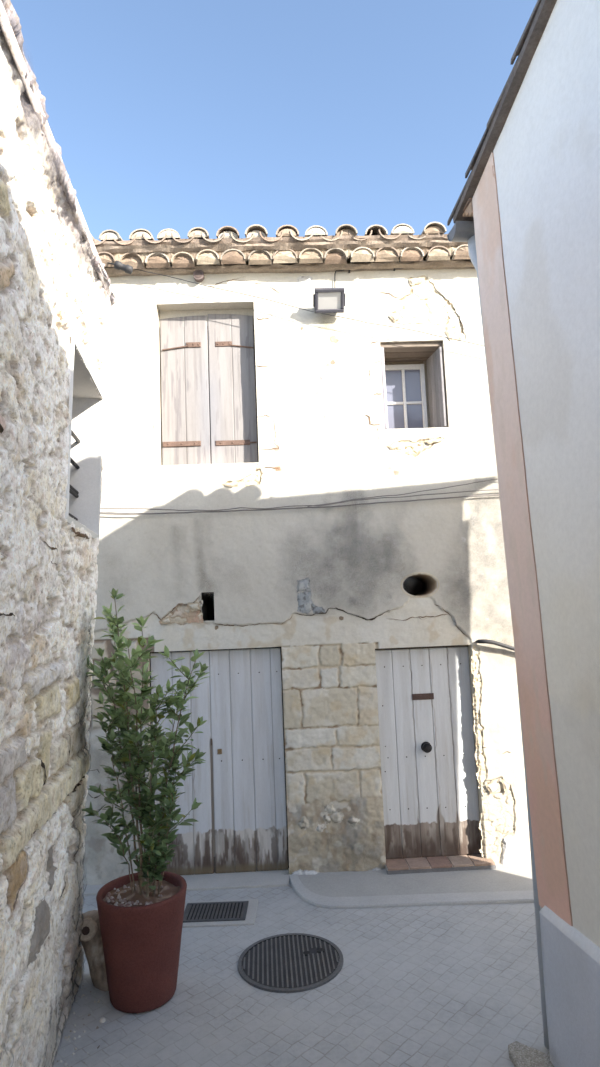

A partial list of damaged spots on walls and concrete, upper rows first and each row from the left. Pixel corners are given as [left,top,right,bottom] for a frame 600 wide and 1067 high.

flaking render [388,275,466,343]
flaking render [387,436,445,457]
flaking render [221,468,263,487]
flaking render [159,600,218,630]
crack [217,605,465,635]
flaking render [471,645,517,864]